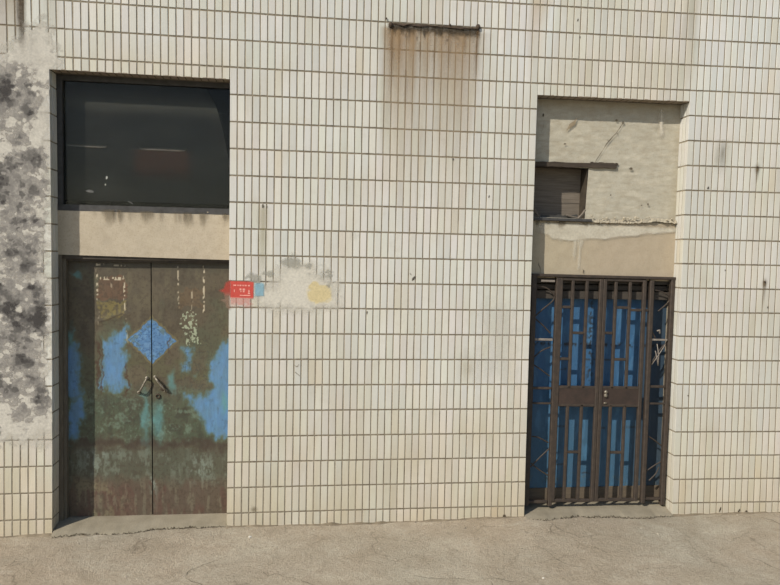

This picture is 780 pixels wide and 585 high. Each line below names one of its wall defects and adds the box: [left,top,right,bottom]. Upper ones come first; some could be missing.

leakage [0,0,62,447]
corrosion [386,25,479,77]